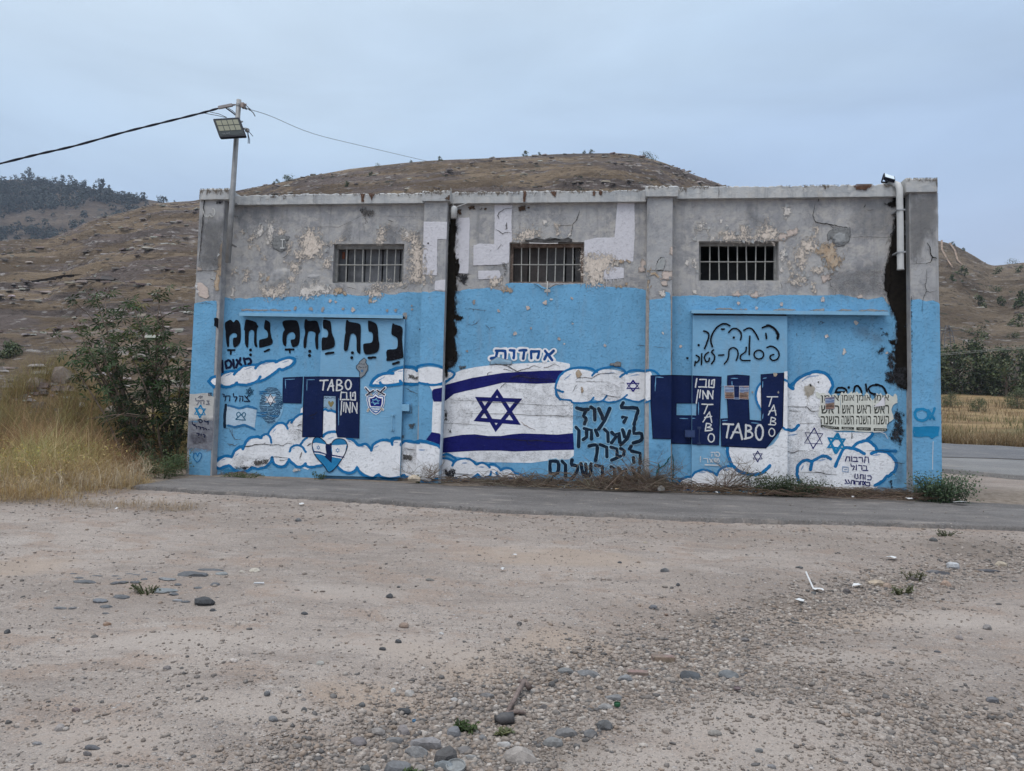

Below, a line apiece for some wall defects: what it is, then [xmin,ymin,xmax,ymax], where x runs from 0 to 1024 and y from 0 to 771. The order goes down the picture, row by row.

peeling [195,220,355,312]
peeling [358,207,435,319]
peeling [571,246,673,369]
peeling [693,204,887,325]